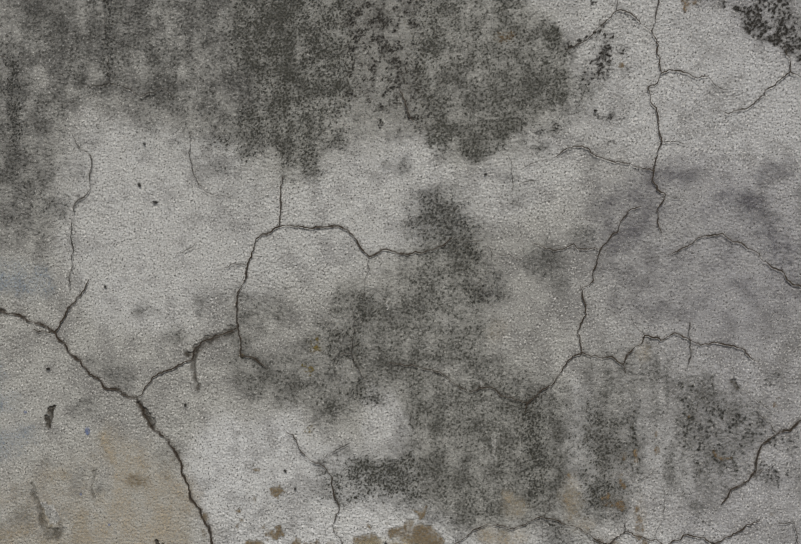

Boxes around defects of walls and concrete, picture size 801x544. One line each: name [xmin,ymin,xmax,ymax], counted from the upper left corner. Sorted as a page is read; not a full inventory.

crack [91,25,174,99]
damp [719,0,801,61]
damp [0,0,628,245]
crack [390,0,801,413]
crack [0,135,521,544]
damp [229,188,651,544]
damp [619,344,797,502]
crack [721,401,801,505]
peeling [246,525,284,544]
peeling [353,506,444,544]
crack [454,496,760,544]